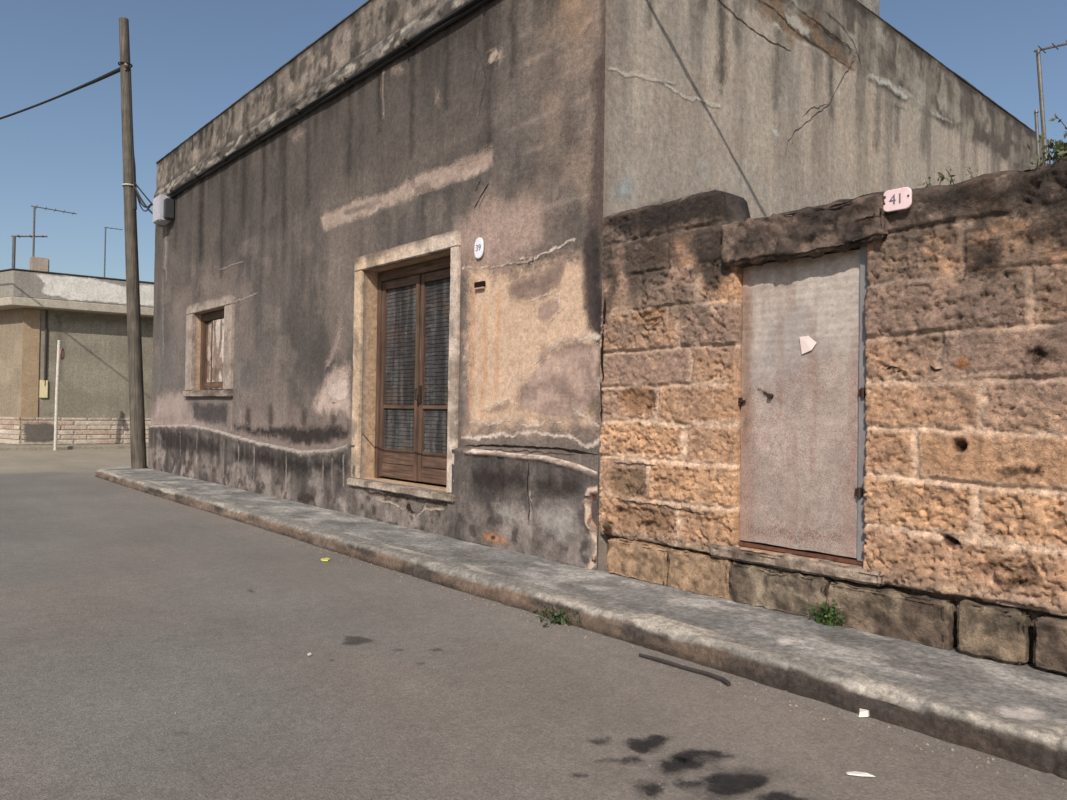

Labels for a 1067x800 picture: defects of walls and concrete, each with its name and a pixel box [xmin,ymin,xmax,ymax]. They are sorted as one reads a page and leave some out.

crack [719,0,790,51]
flaking render [759,0,861,71]
crack [608,67,721,108]
crack [786,59,856,151]
flaking render [870,74,911,111]
flaking render [322,150,493,230]
flaking render [312,314,351,419]
flaking render [461,238,601,449]
leakage [150,402,348,486]
crack [466,444,655,537]
crack [618,498,701,514]